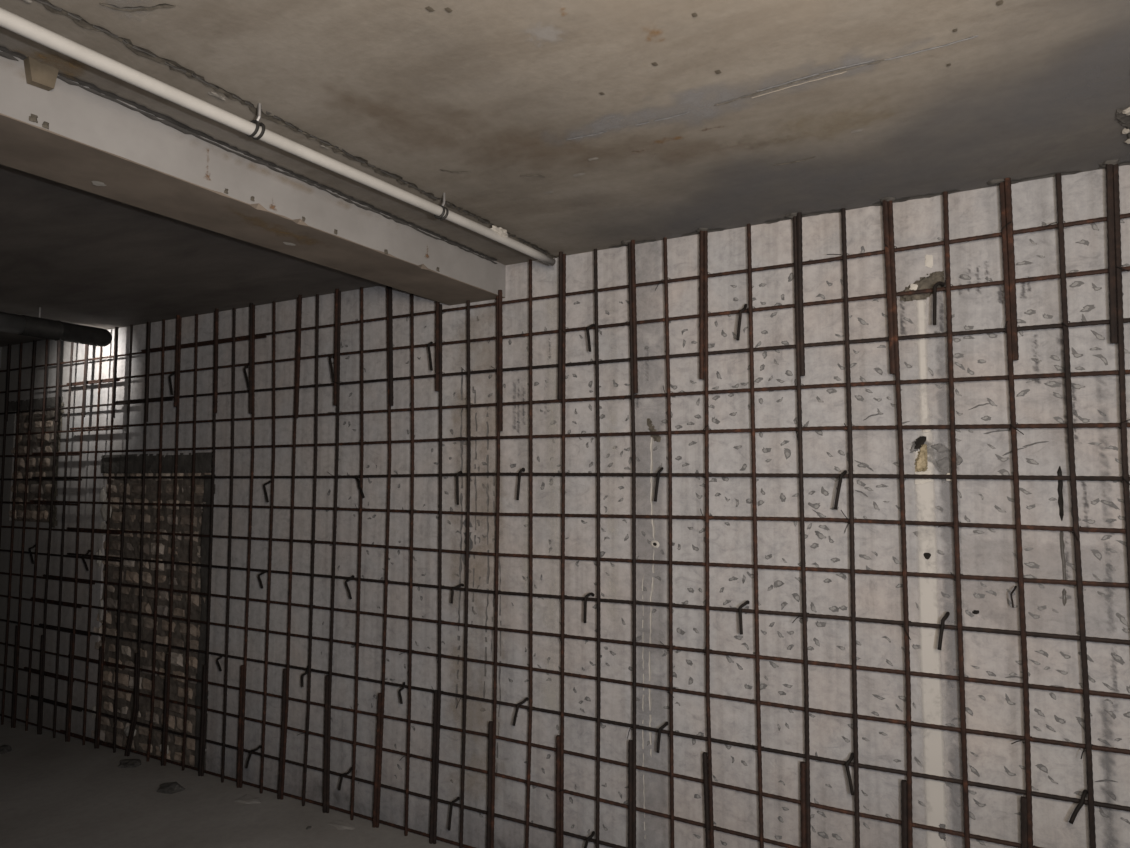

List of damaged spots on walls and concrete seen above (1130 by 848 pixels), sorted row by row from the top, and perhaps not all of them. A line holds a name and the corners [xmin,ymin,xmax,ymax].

spalling [1115,107,1130,144]